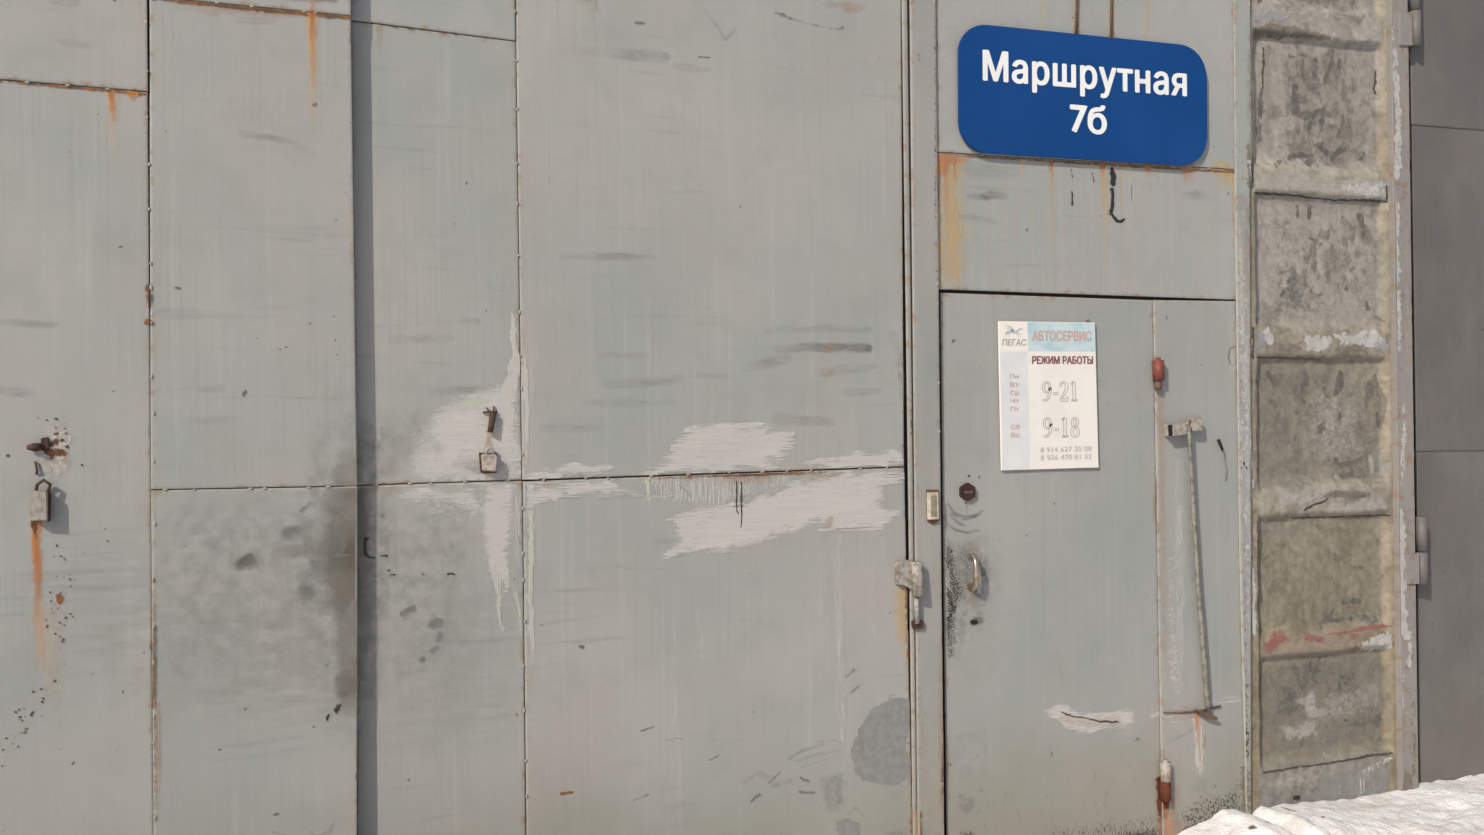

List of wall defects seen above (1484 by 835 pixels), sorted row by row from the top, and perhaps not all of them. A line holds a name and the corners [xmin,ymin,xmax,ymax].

corrosion [163,0,511,52]
corrosion [0,81,148,112]
corrosion [938,153,1235,277]
corrosion [30,520,42,599]
corrosion [1156,776,1189,835]